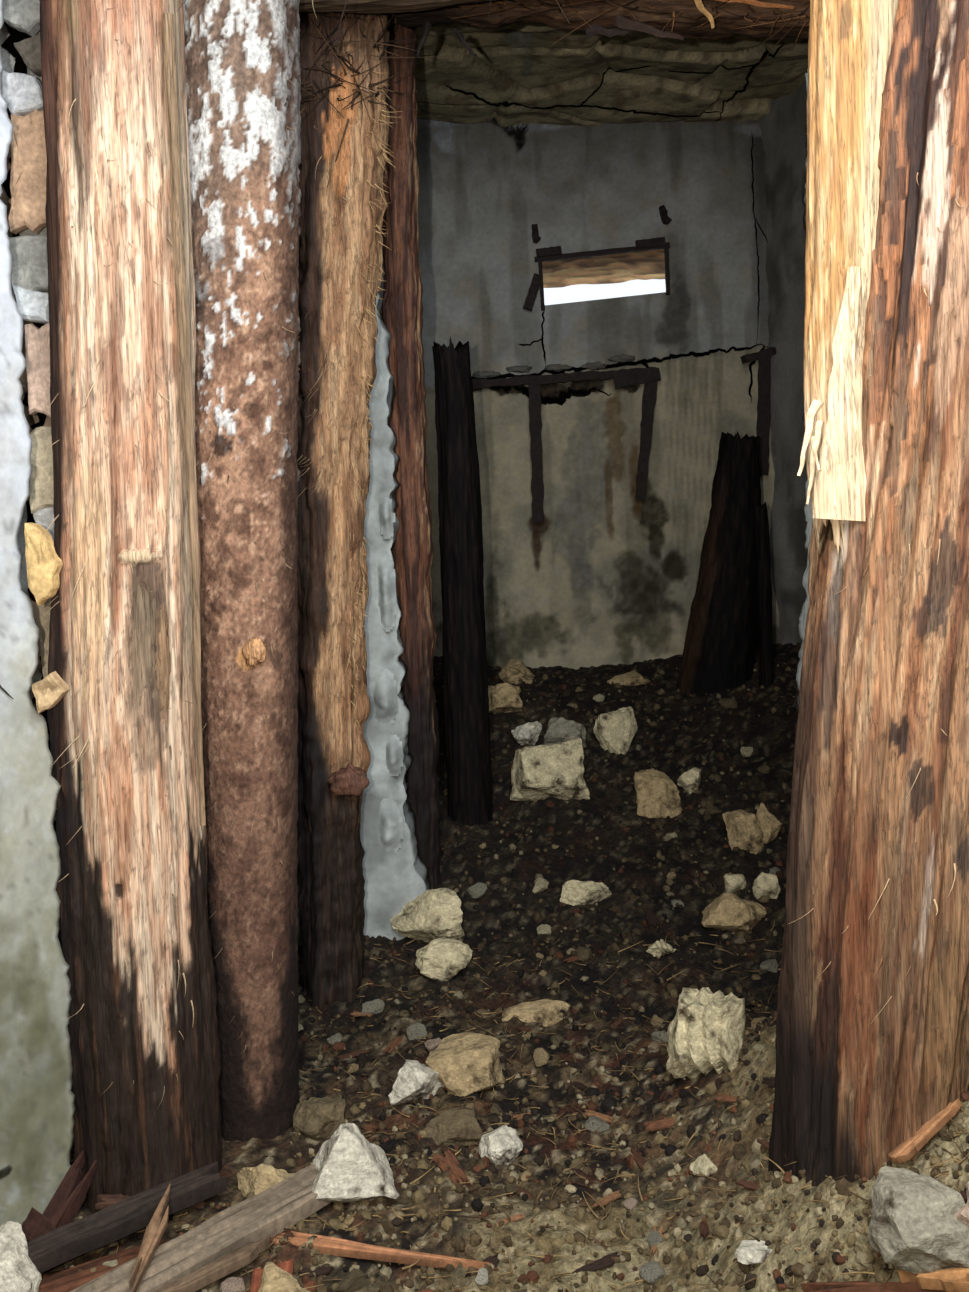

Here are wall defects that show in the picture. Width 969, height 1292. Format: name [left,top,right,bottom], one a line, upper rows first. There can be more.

crack [1,21,32,74]
crack [446,43,784,121]
crack [2,157,12,199]
crack [472,133,768,405]
spalling [2,0,70,713]
crack [22,390,47,430]
crack [26,501,36,523]
corrosion [530,516,548,568]
damp [616,476,685,661]
crack [0,656,51,753]